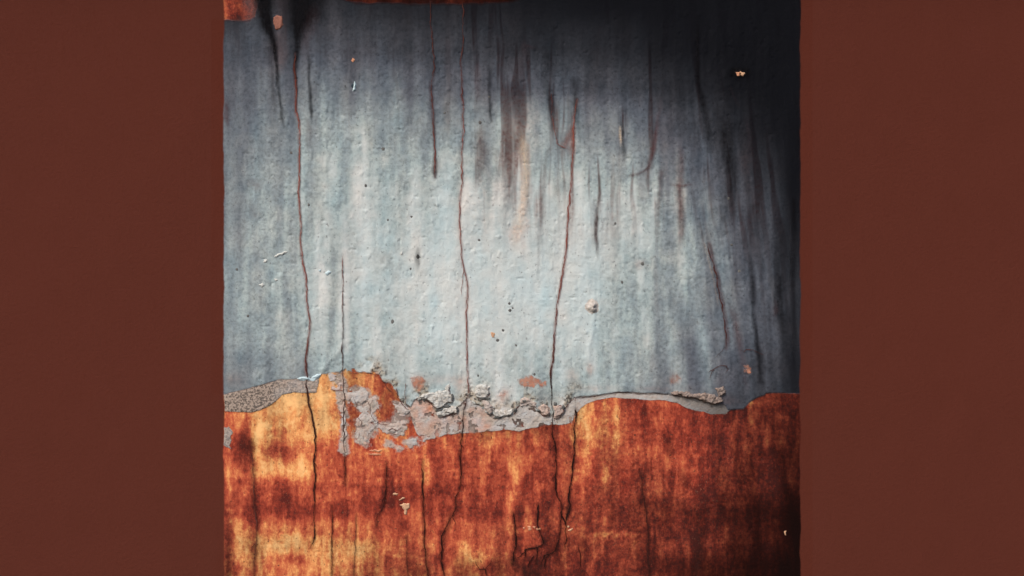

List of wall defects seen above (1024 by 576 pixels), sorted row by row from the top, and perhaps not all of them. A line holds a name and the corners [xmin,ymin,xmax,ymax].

corrosion [223,0,257,22]
crack [293,54,387,572]
crack [406,0,469,576]
peeling [224,373,730,455]
corrosion [223,369,801,576]
crack [475,93,680,576]